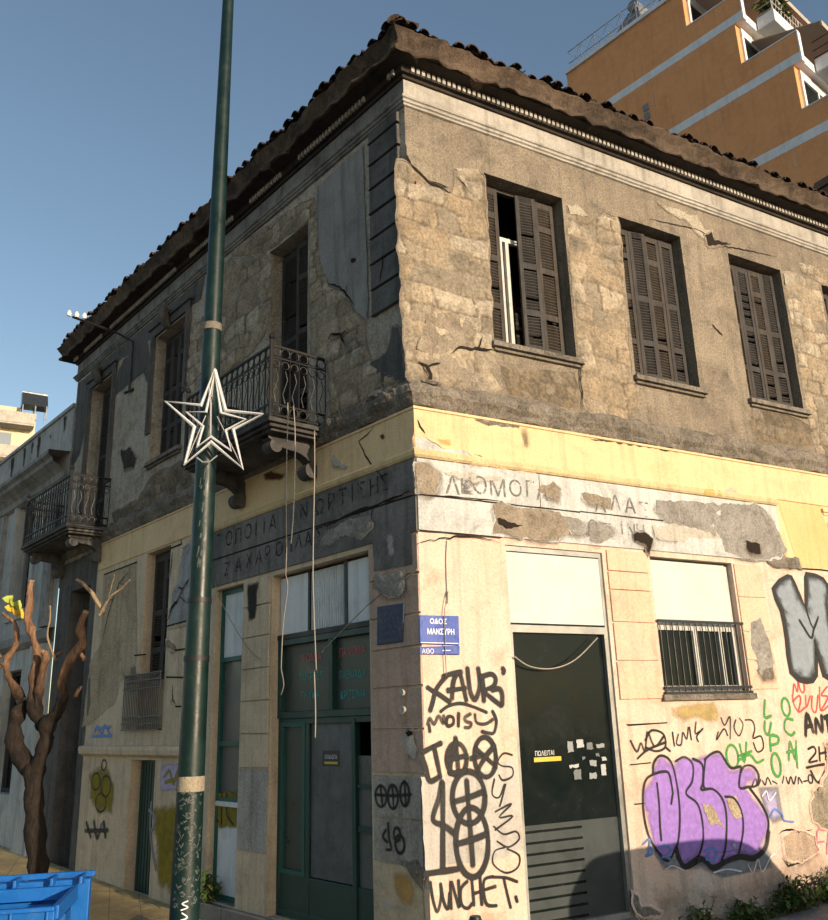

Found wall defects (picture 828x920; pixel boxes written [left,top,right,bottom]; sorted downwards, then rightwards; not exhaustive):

crack [405,144,451,199]
crack [329,283,353,303]
crack [358,426,383,477]
spalling [412,434,508,495]
spalling [319,514,374,548]
crack [326,491,497,526]
spalling [491,481,617,544]
spalling [652,488,802,570]
peeling [165,542,191,653]
spalling [748,618,774,681]
spalling [780,828,820,864]